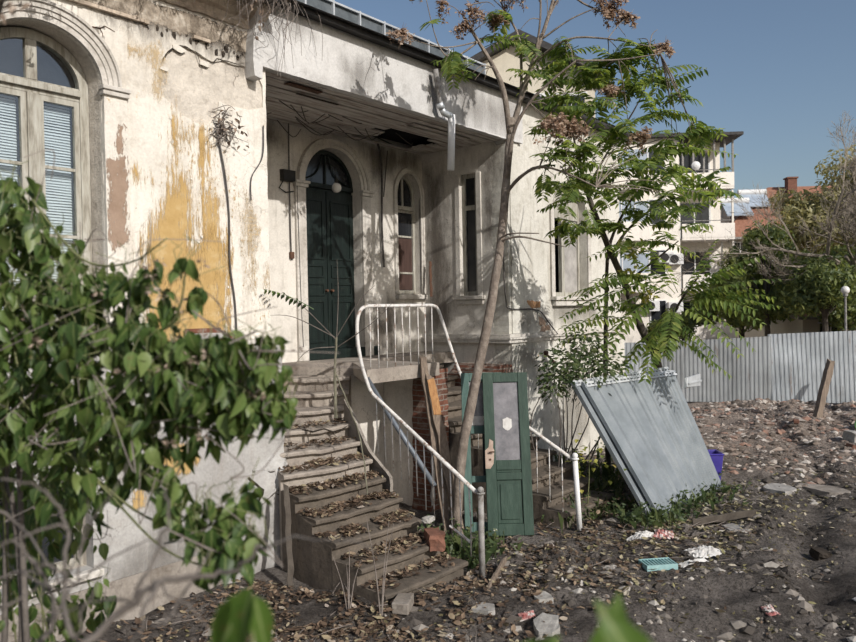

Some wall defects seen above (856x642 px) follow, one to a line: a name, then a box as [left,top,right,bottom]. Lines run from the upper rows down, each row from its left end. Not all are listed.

peeling [106,25,270,341]
spalling [527,300,551,332]